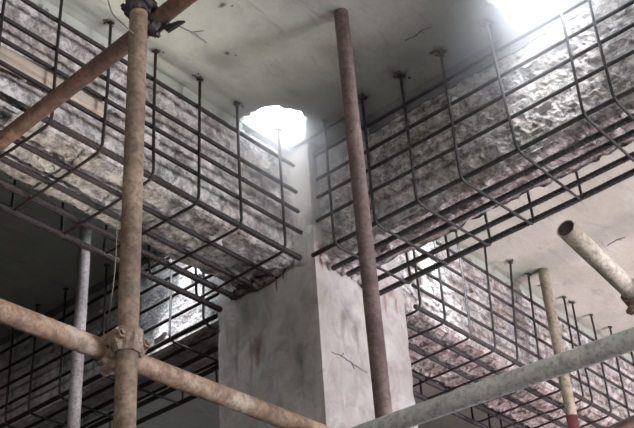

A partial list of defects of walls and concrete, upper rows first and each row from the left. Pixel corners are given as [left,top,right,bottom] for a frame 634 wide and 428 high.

spalling [0,0,107,76]
spalling [0,61,127,232]
spalling [139,78,295,372]
spalling [316,140,360,281]
spalling [362,0,634,391]
spalling [52,304,75,326]
spalling [86,279,119,335]
spalling [0,333,72,428]
spalling [80,355,115,425]
spalling [479,377,568,428]
spalling [570,357,634,428]